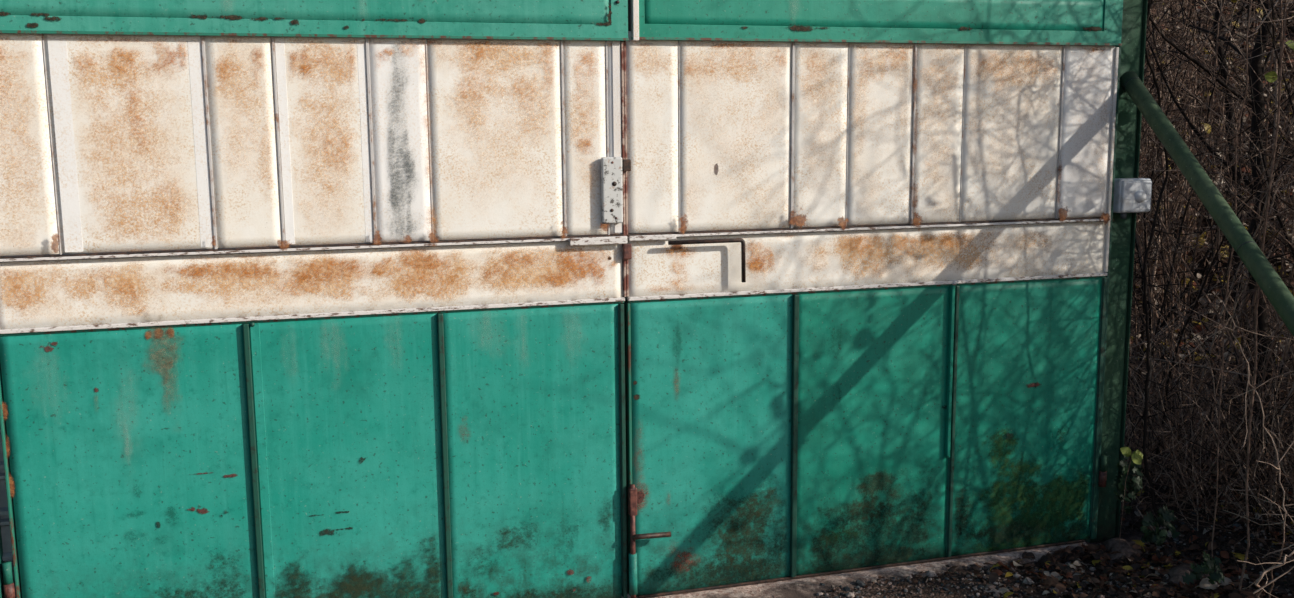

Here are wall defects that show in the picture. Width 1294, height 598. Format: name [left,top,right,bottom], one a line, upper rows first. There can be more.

rust [191,14,299,25]
rust [344,18,427,29]
rust [79,40,185,234]
rust [291,44,352,193]
water stain [390,131,415,234]
rust [1,265,147,314]
rust [164,257,359,307]
rust [375,212,613,301]
rust [666,214,688,287]
rust [789,208,807,232]
rust [815,184,993,276]
rust [145,328,174,339]